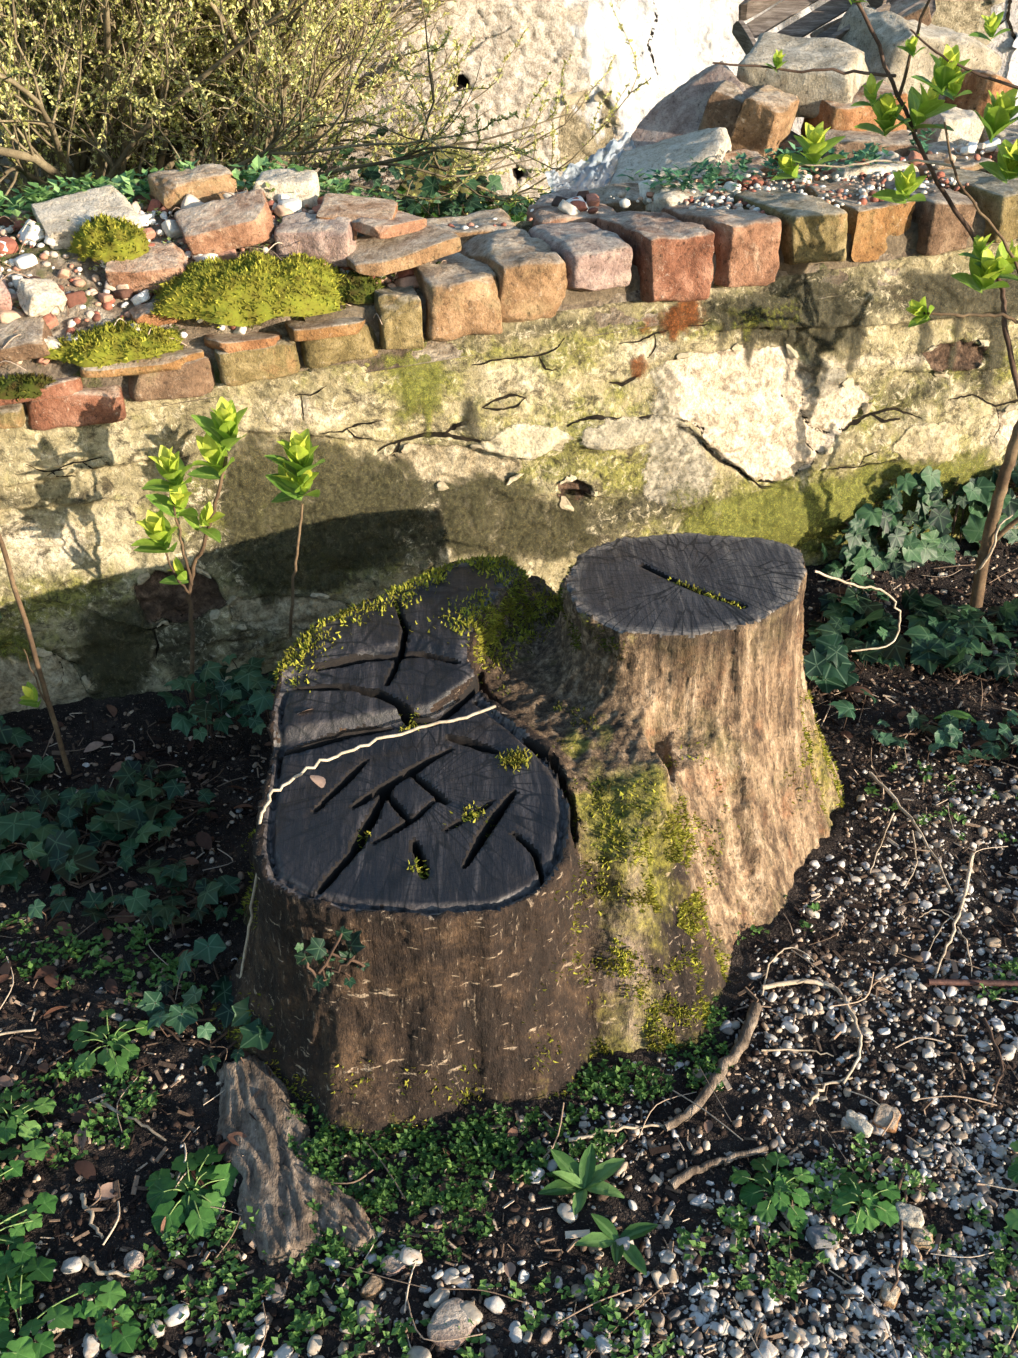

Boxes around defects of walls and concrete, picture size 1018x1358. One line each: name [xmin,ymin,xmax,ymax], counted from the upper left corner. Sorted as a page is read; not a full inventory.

crack [638,0,658,75]
peeling [1007,34,1018,123]
crack [567,324,922,489]
crack [950,394,1018,438]